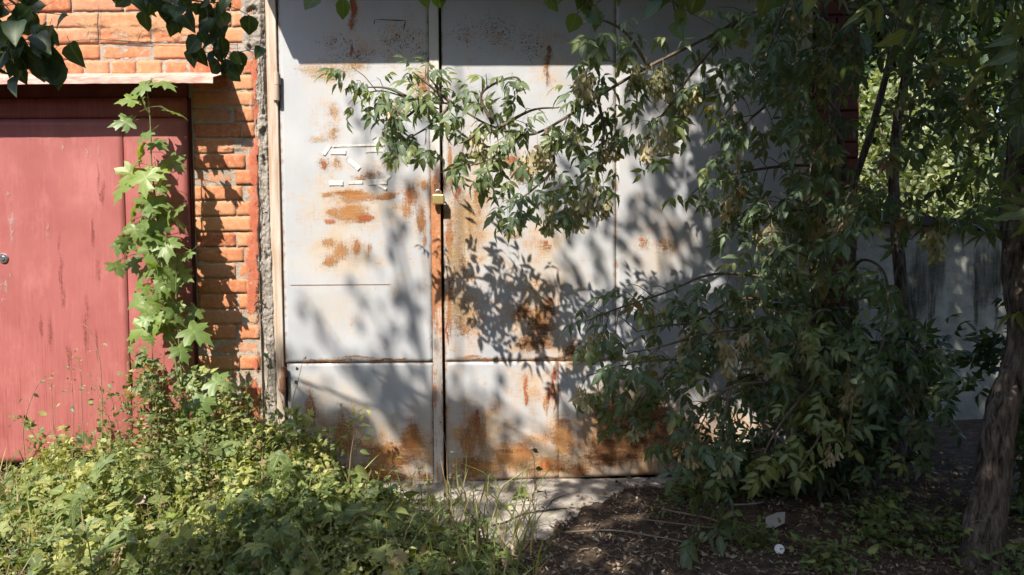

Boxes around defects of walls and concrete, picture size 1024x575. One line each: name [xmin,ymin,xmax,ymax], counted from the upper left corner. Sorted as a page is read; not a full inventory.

rust [323,171,428,246]
rust [323,238,369,265]
rust [461,298,694,477]
rust [310,416,432,483]